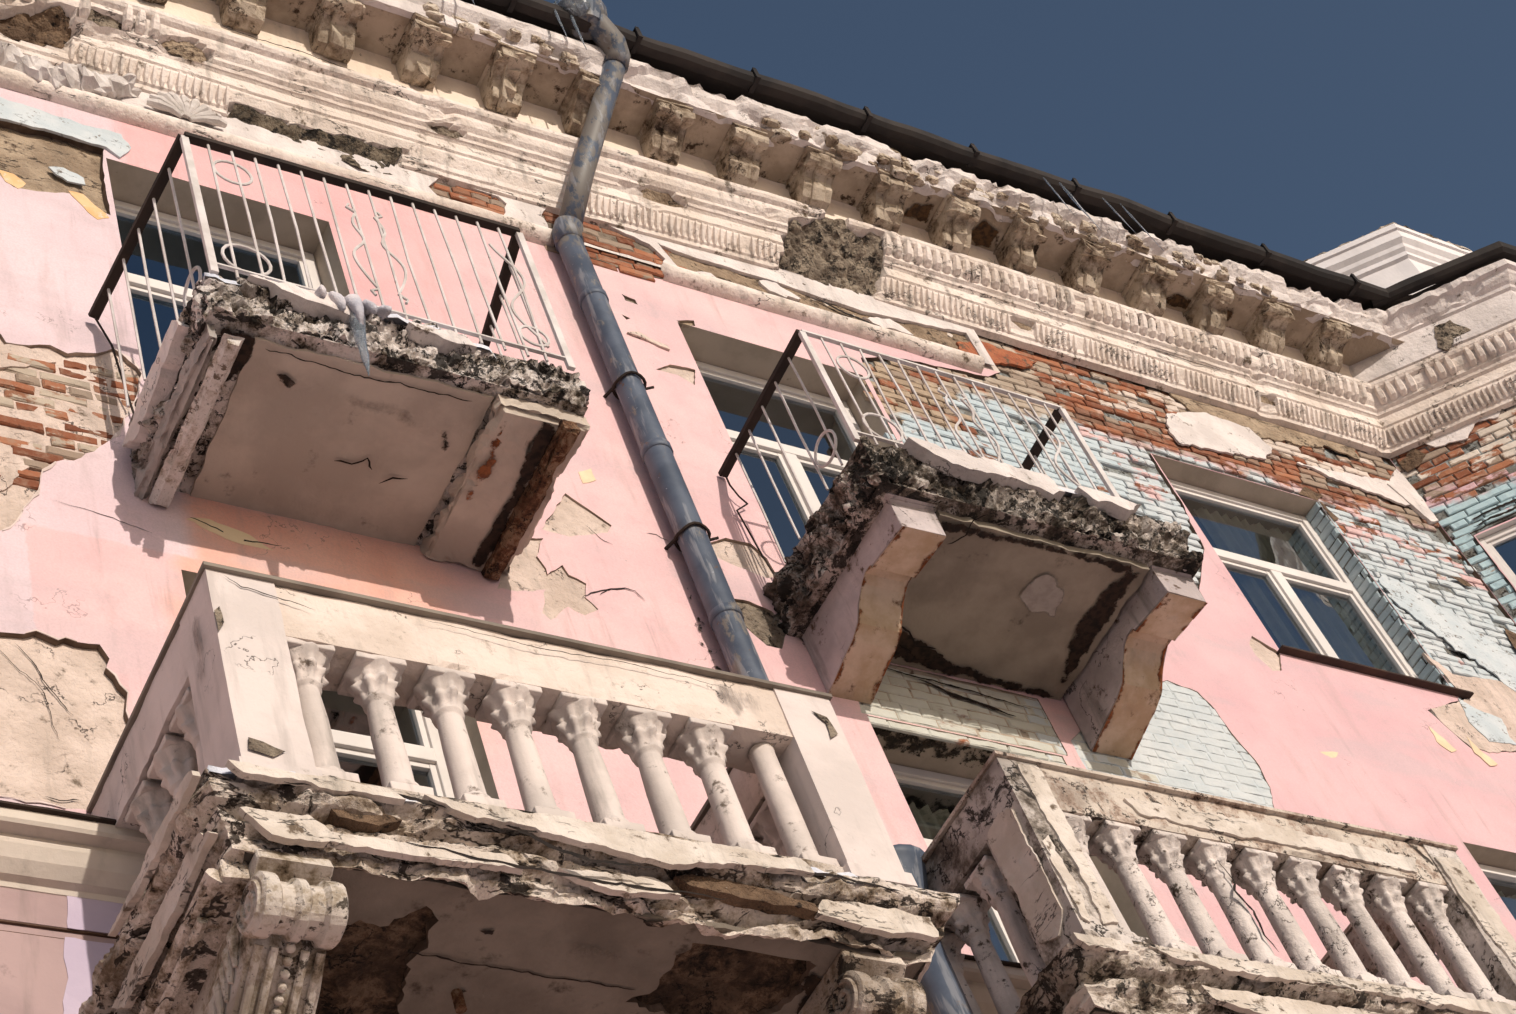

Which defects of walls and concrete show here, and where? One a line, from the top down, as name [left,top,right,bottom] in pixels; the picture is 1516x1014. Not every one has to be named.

spalling [0,97,131,220]
spalling [761,117,1278,302]
spalling [1434,320,1471,351]
spalling [0,339,142,531]
rust [466,431,502,500]
flaking render [860,335,1516,766]
spalling [0,629,130,810]
spalling [812,711,838,738]
flaking render [859,631,1274,808]
spalling [315,906,435,1014]
spalling [636,943,821,1014]